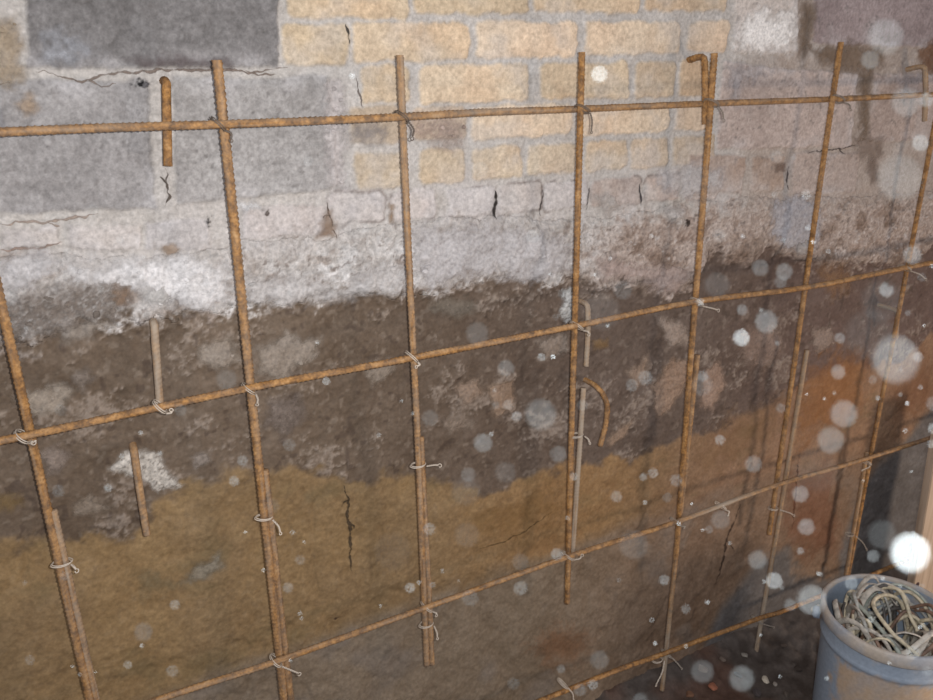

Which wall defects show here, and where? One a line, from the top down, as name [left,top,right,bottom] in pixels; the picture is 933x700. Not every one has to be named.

crack [37,67,288,87]
damp [737,4,883,181]
crack [160,168,171,203]
crack [491,191,499,220]
damp [70,245,231,310]
damp [246,263,405,303]
damp [602,261,687,293]
damp [560,288,573,323]
crack [343,486,355,571]
crack [716,507,740,583]